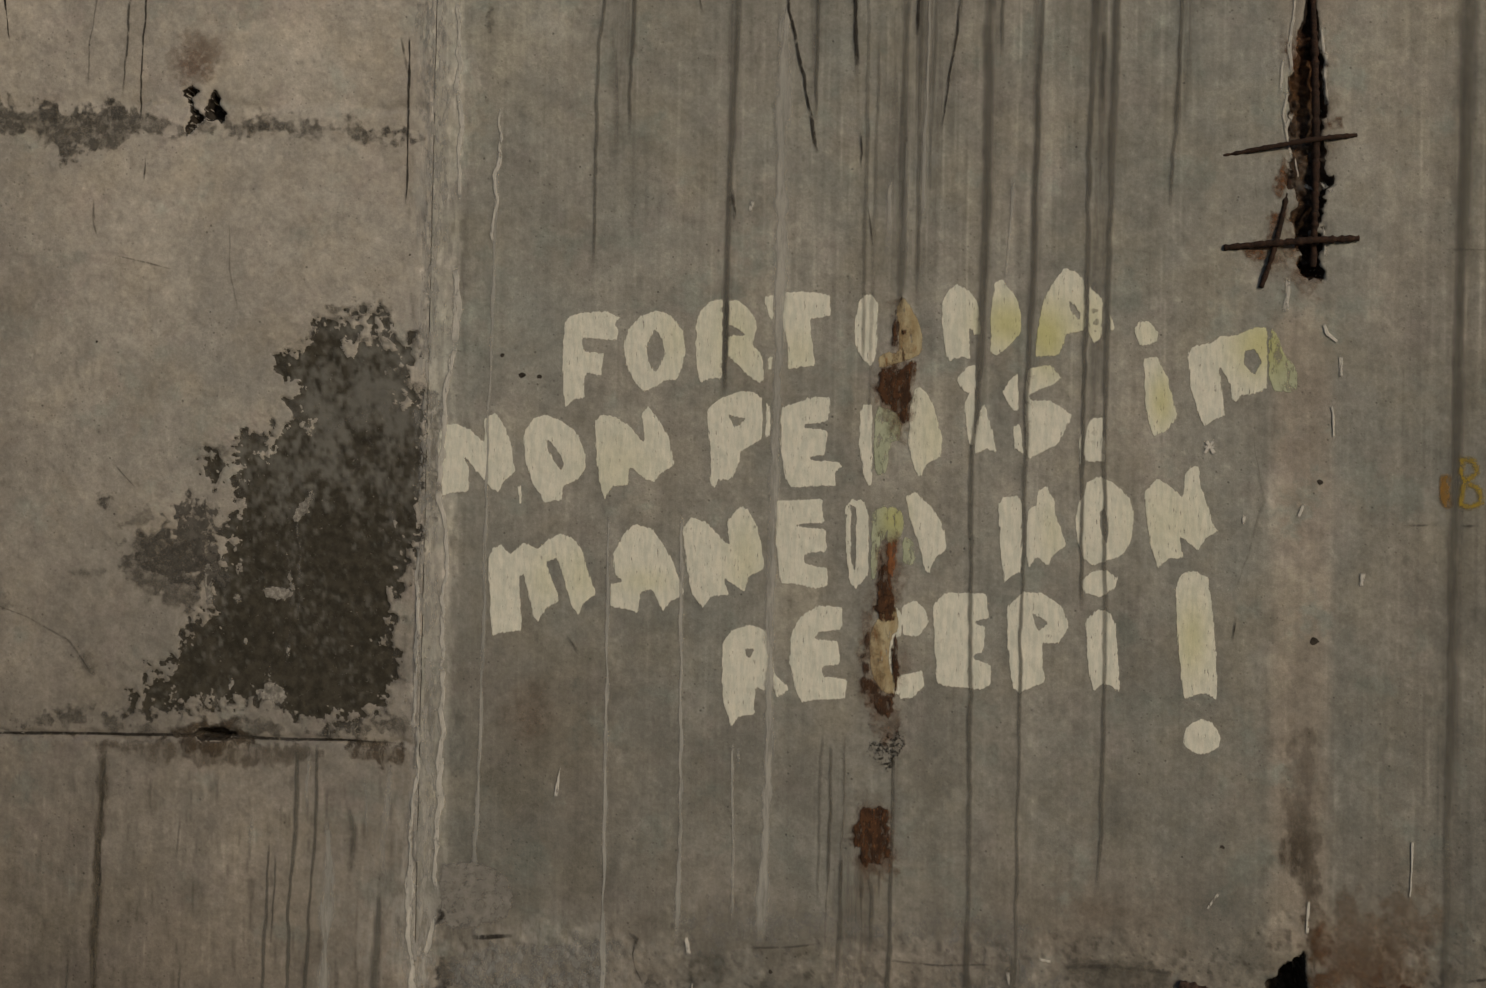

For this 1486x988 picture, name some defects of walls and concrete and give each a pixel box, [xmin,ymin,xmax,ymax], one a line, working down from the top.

spalling [183,85,227,136]
crack [787,0,817,147]
crack [852,0,860,58]
corrosion [1223,0,1360,288]
spalling [1280,0,1332,191]
corrosion [876,297,917,423]
water stain [968,0,1004,813]
water stain [1080,0,1120,868]
water stain [307,270,622,988]
corrosion [861,534,899,719]
crack [0,731,367,742]
spalling [1265,951,1307,988]